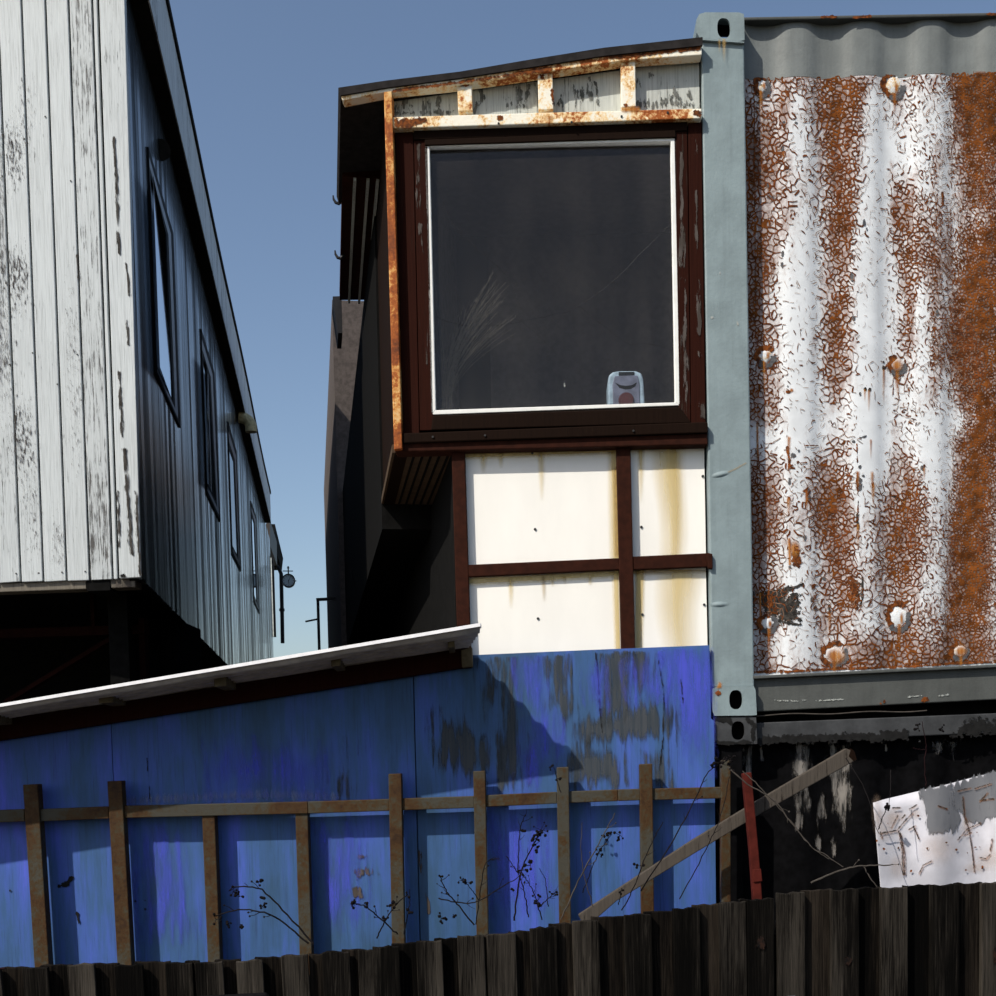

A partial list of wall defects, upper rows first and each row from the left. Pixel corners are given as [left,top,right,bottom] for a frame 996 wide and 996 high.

rust [392,67,554,120]
rust [609,46,701,59]
peeling [636,86,700,110]
rust [745,95,786,341]
rust [751,72,996,674]
water stain [465,450,619,558]
water stain [663,450,677,539]
water stain [469,571,620,649]
water stain [633,569,695,648]
peeling [753,577,826,625]
peeling [430,657,547,792]
peeling [530,649,710,791]